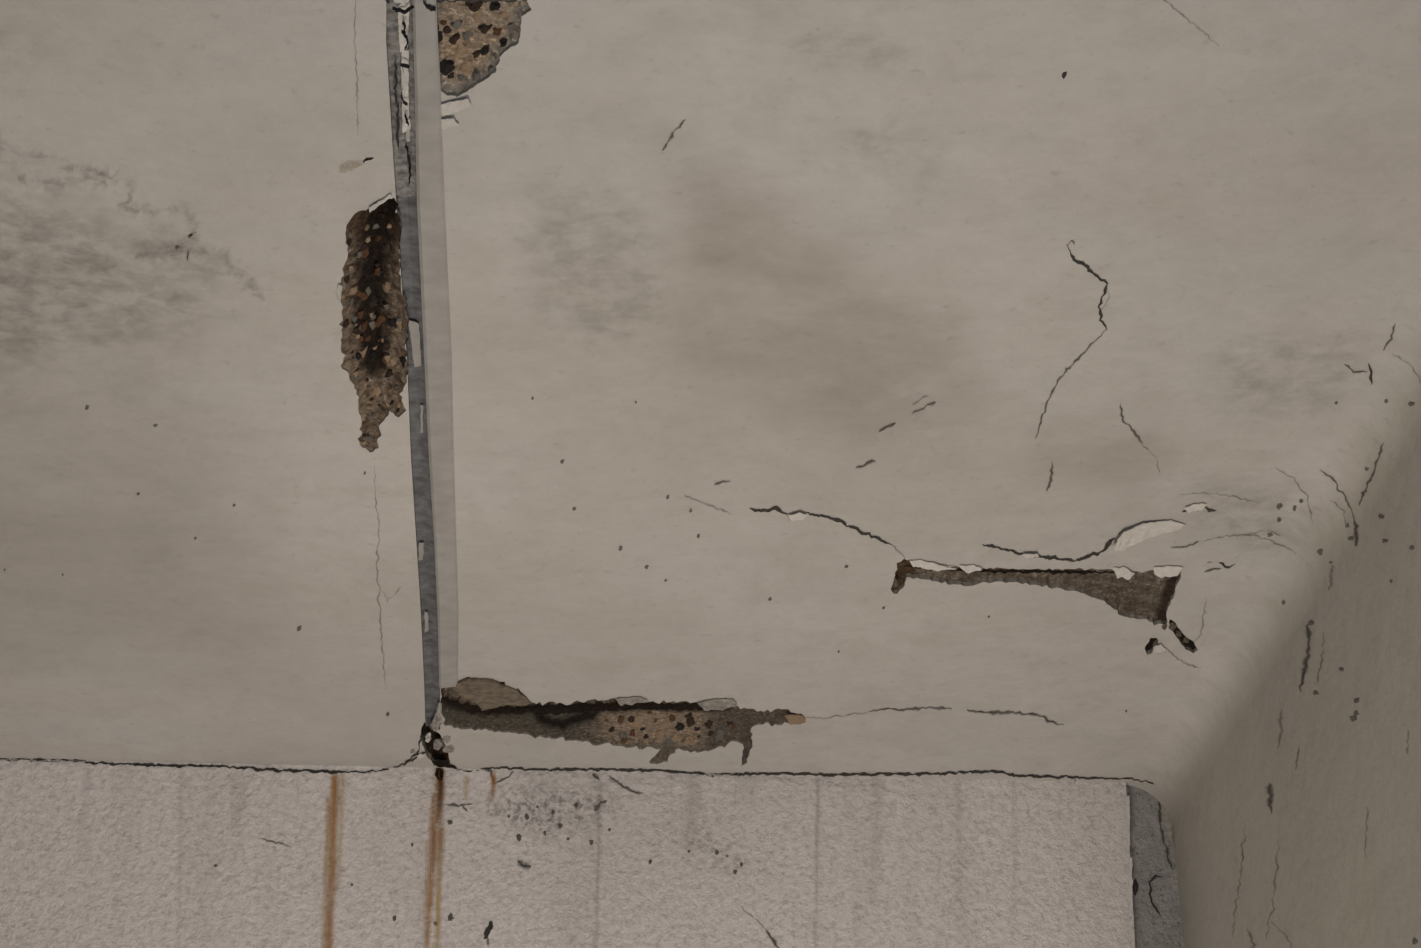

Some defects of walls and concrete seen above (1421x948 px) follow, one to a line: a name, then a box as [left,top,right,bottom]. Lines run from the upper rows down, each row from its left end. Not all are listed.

spalling [436,0,531,129]
spalling [337,193,423,452]
crack [1035,240,1108,491]
crack [715,481,905,559]
crack [982,538,1115,562]
spalling [882,559,1198,658]
spalling [440,677,806,765]
crack [835,707,1063,725]
rust [326,776,337,884]
rust [403,703,456,934]